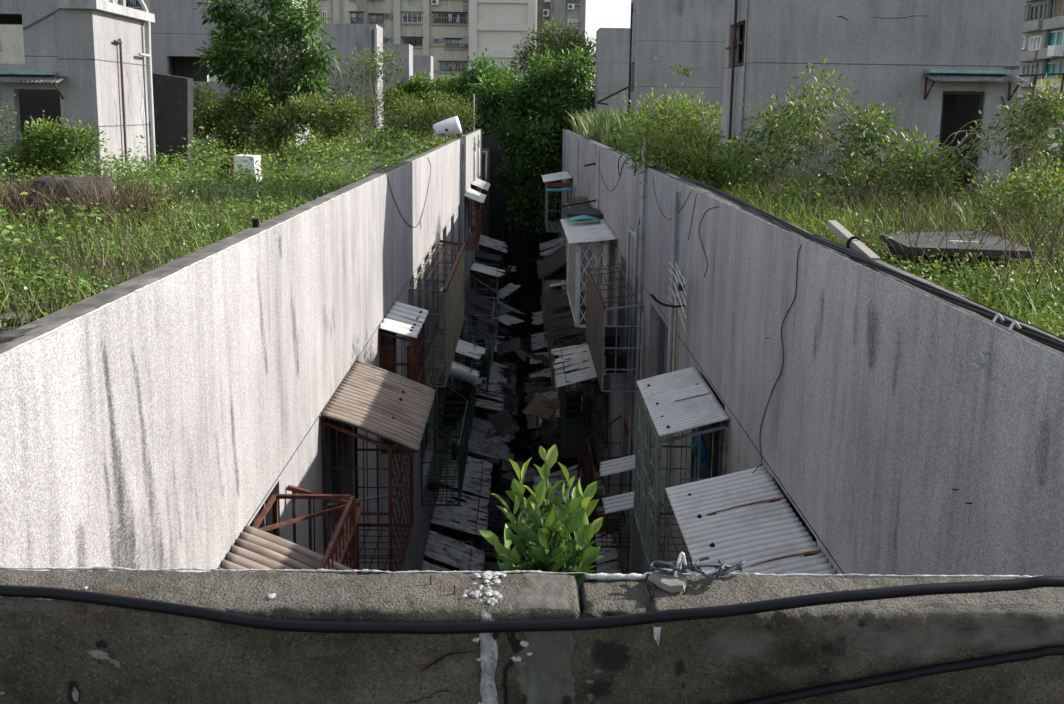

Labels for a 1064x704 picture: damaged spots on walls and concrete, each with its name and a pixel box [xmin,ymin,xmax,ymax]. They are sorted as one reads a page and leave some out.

leakage [104,347,139,571]
leakage [133,359,166,569]
efflorescence [463,571,506,704]